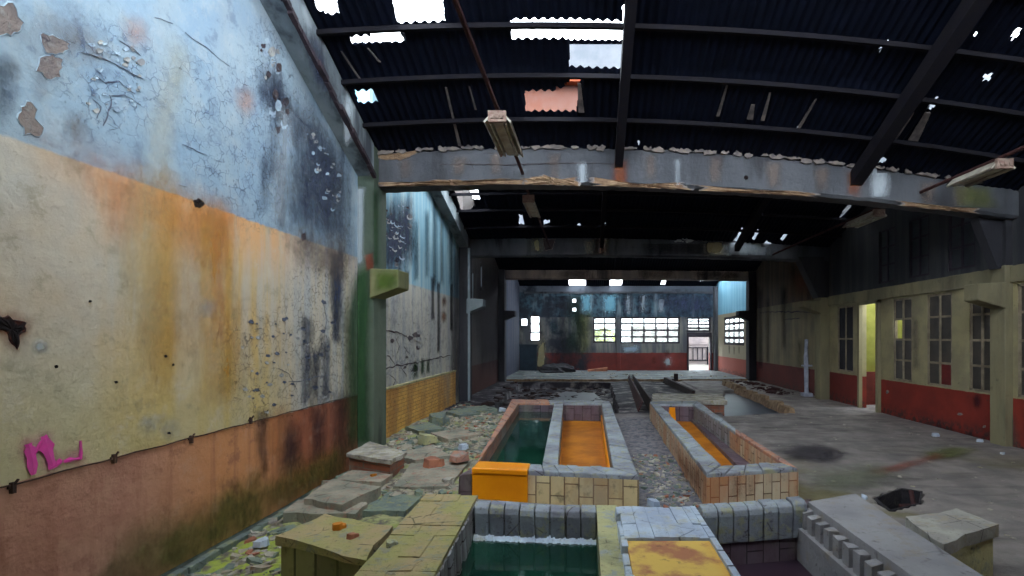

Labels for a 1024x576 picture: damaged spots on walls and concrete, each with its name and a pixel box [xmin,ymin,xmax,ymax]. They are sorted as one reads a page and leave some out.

spalling [0,1,24,37]
spalling [36,32,70,80]
crack [82,40,143,126]
peeling [260,38,289,134]
spalling [16,100,44,138]
peeling [307,133,341,177]
water stain [261,74,362,402]
crack [278,303,333,389]
spalling [873,488,923,512]